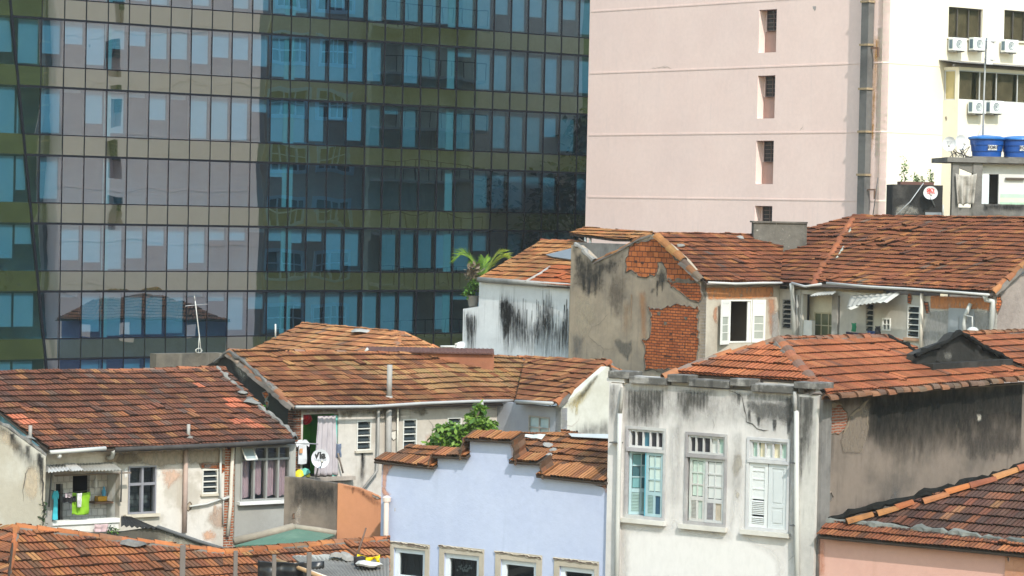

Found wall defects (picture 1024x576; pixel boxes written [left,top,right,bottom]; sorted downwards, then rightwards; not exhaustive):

damp [464,314,476,347]
damp [500,296,581,357]
damp [576,255,621,309]
flaking render [616,237,779,373]
damp [629,391,660,416]
damp [785,396,813,472]
peeling [831,400,869,452]
damp [863,384,1023,457]